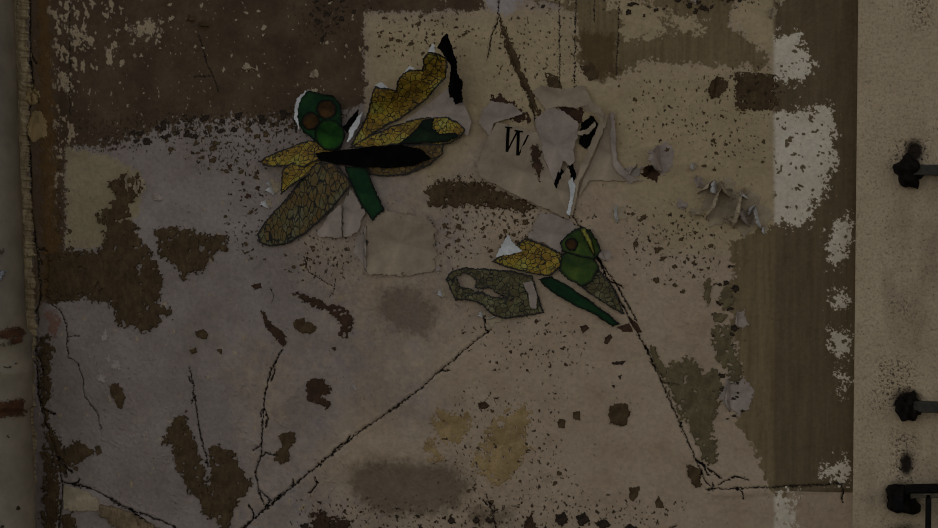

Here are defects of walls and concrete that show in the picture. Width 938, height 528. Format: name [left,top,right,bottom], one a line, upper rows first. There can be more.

crack [487,1,506,58]
spalling [708,72,779,120]
peeling [128,108,298,221]
spalling [44,171,266,334]
corrosion [0,326,27,347]
corrosion [0,396,28,418]
crack [28,138,176,528]
crack [188,367,209,467]
spalling [161,410,254,528]
crack [243,316,490,528]
spalling [649,244,755,488]
crack [596,257,844,503]